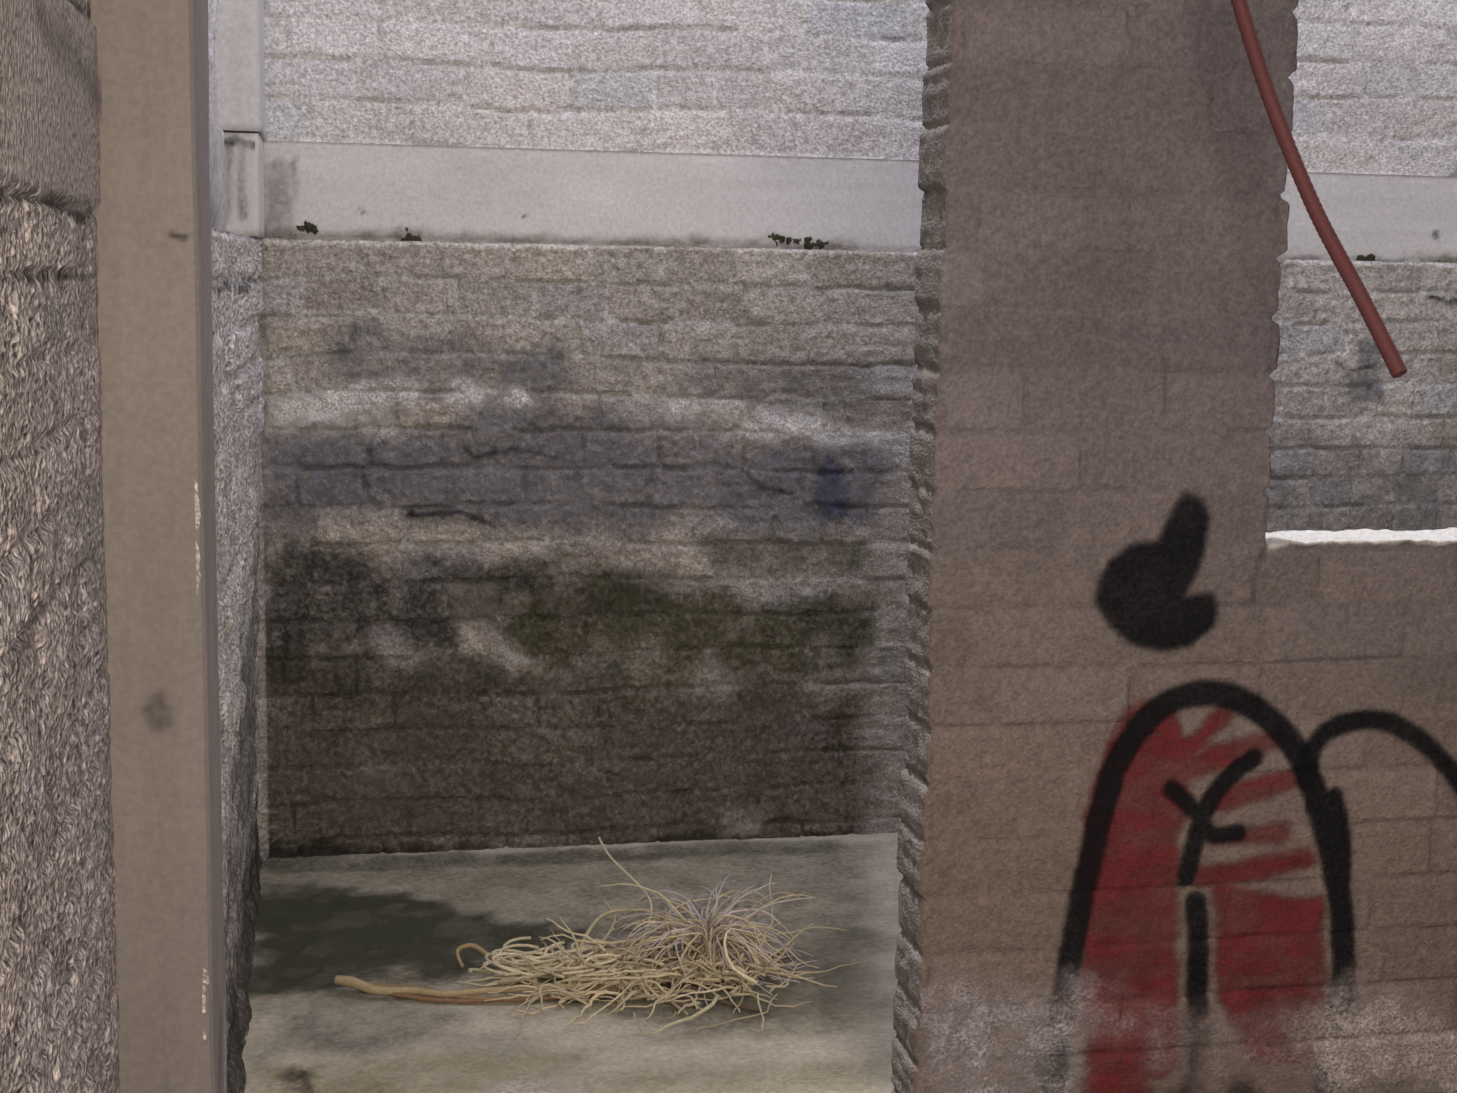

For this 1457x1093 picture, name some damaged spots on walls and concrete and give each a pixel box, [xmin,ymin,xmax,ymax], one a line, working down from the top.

damp [224,324,881,1025]